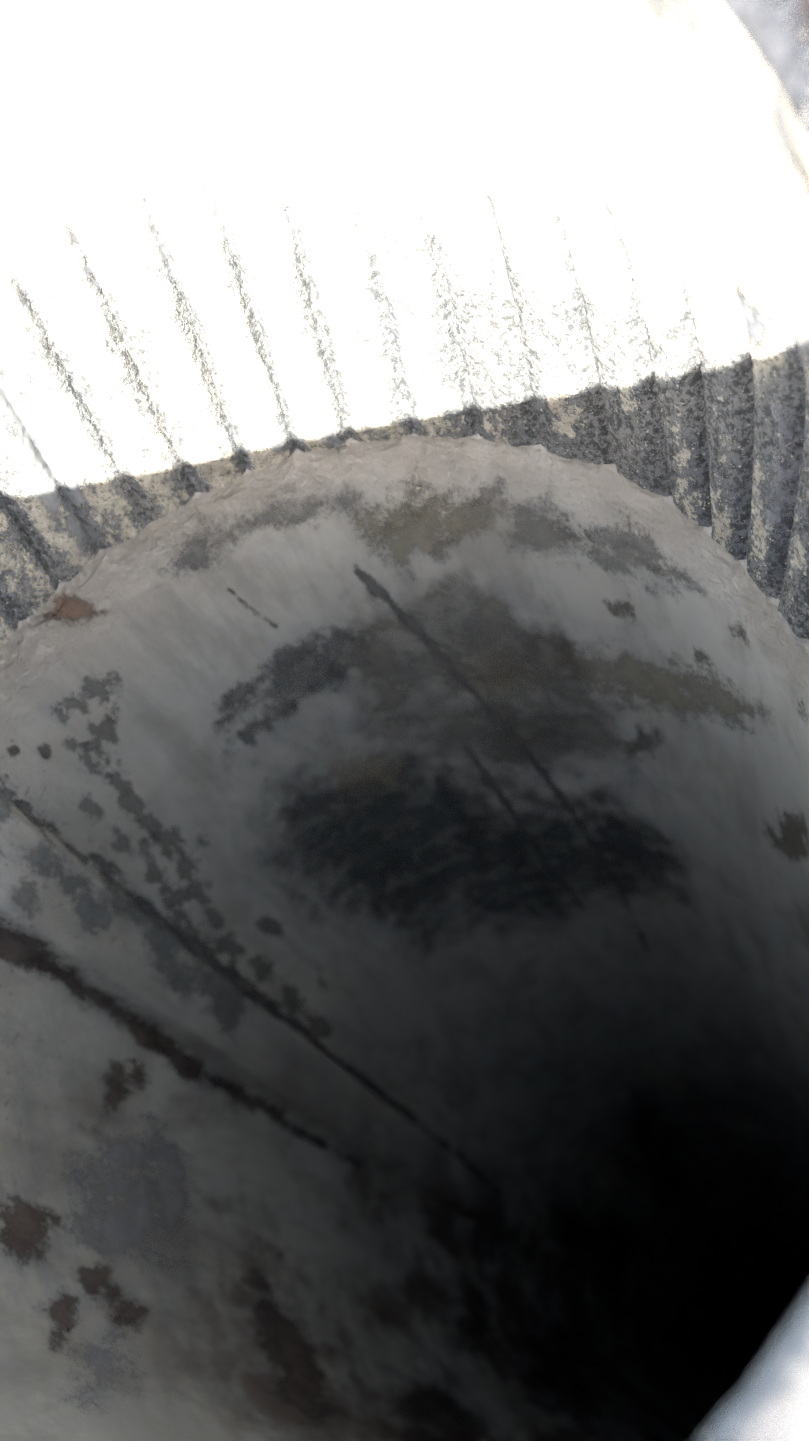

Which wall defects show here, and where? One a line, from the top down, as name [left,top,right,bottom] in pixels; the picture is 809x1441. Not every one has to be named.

damp [217,647,335,746]
damp [264,753,677,947]
crack [0,774,502,1197]
damp [242,1266,338,1427]